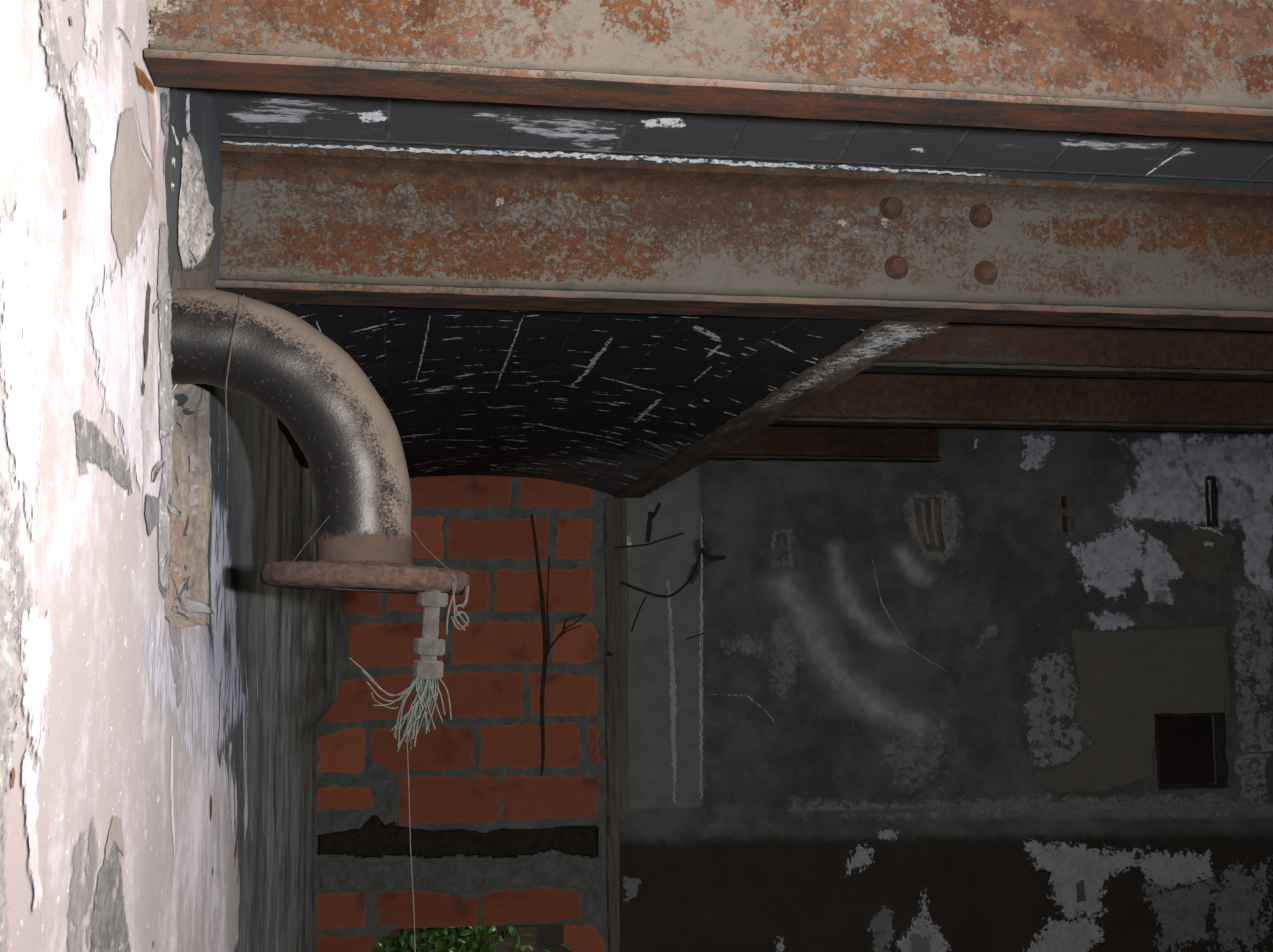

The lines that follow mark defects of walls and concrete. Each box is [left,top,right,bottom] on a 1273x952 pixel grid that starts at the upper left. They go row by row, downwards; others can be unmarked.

rust [262,0,444,57]
rust [600,0,686,46]
rust [764,0,827,73]
rust [866,0,1024,85]
rust [274,187,667,285]
rust [1022,213,1273,256]
spalling [74,93,215,708]
peeling [0,474,31,952]
flaking render [1034,623,1232,794]
peeling [68,815,131,952]
peeling [867,889,951,952]
peeling [1019,839,1273,952]